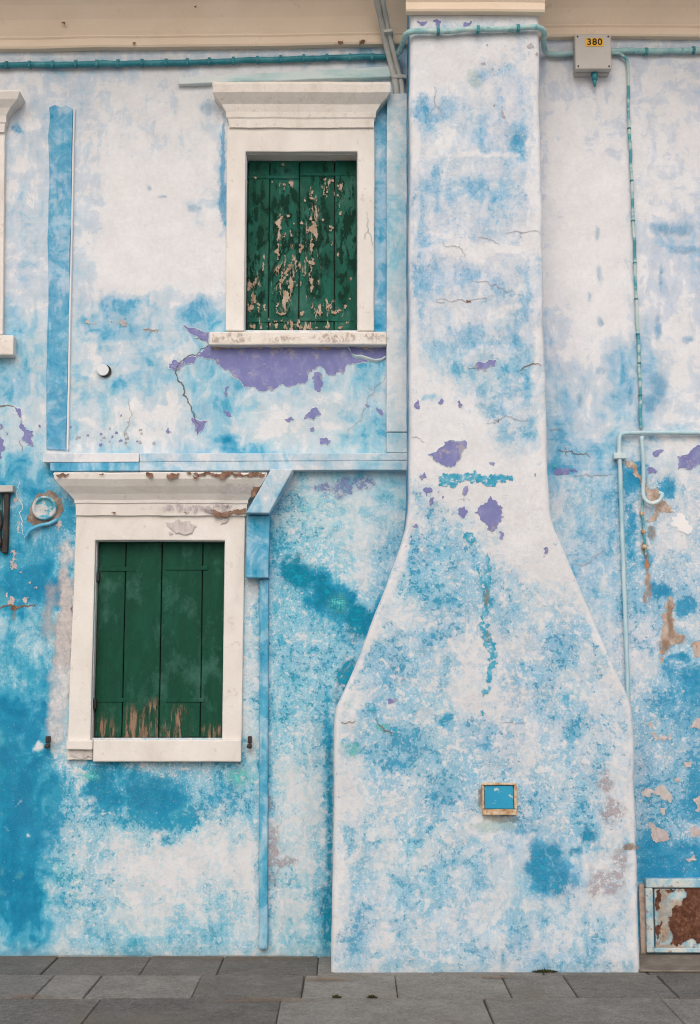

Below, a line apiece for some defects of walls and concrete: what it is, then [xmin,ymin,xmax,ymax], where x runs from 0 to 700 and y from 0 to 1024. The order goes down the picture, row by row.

crack [442,280,513,303]
crack [168,338,209,436]
peeling [171,325,386,397]
peeling [0,405,41,459]
spalling [17,490,64,533]
spalling [166,471,266,524]
peeling [419,439,513,540]
spalling [625,449,693,534]
peeling [677,445,700,471]
spalling [659,596,700,664]
spalling [641,761,692,843]
rust [655,888,700,948]